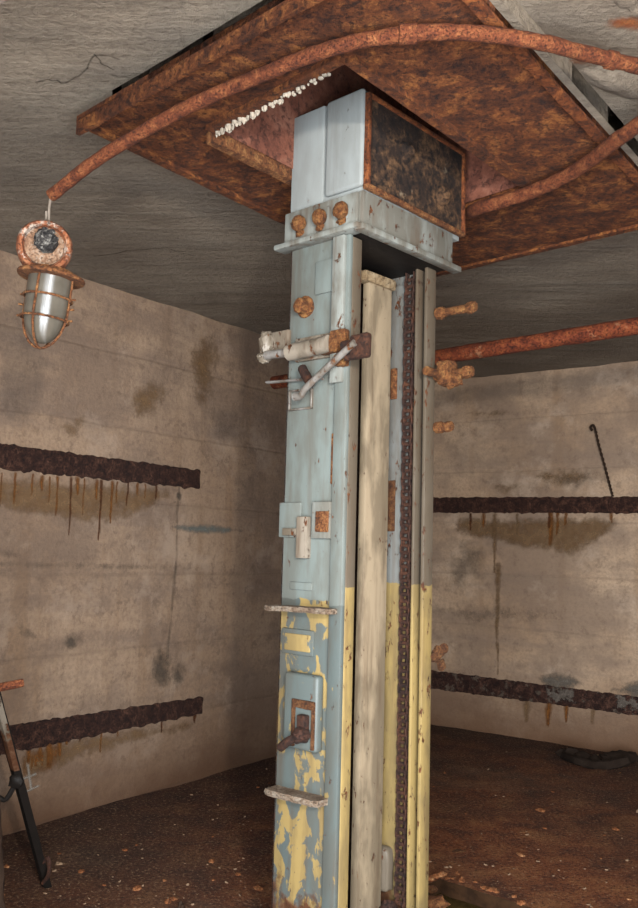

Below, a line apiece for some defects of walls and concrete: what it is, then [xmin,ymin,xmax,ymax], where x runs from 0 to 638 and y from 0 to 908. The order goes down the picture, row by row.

corrosion [0,473,160,540]
corrosion [458,513,613,653]